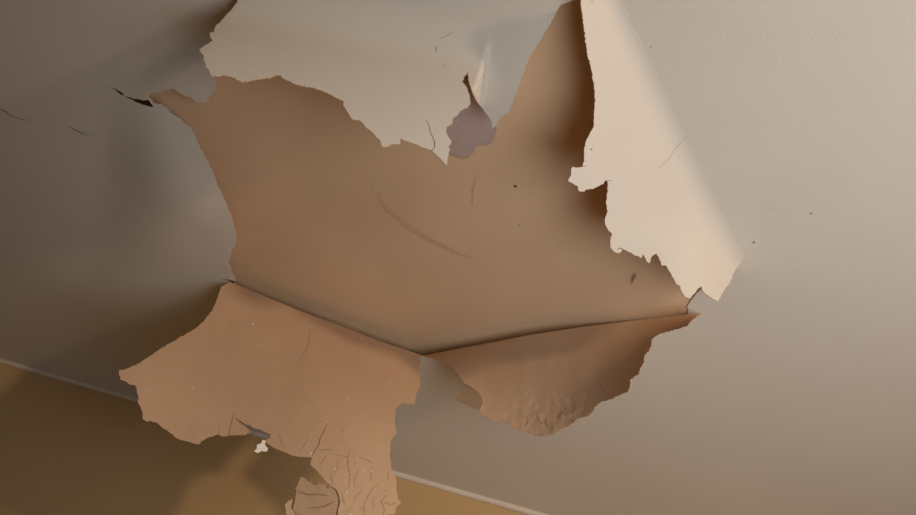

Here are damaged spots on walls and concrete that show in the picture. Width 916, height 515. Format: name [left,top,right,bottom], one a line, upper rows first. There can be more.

crack [113,88,153,107]
flaking render [78,0,744,515]